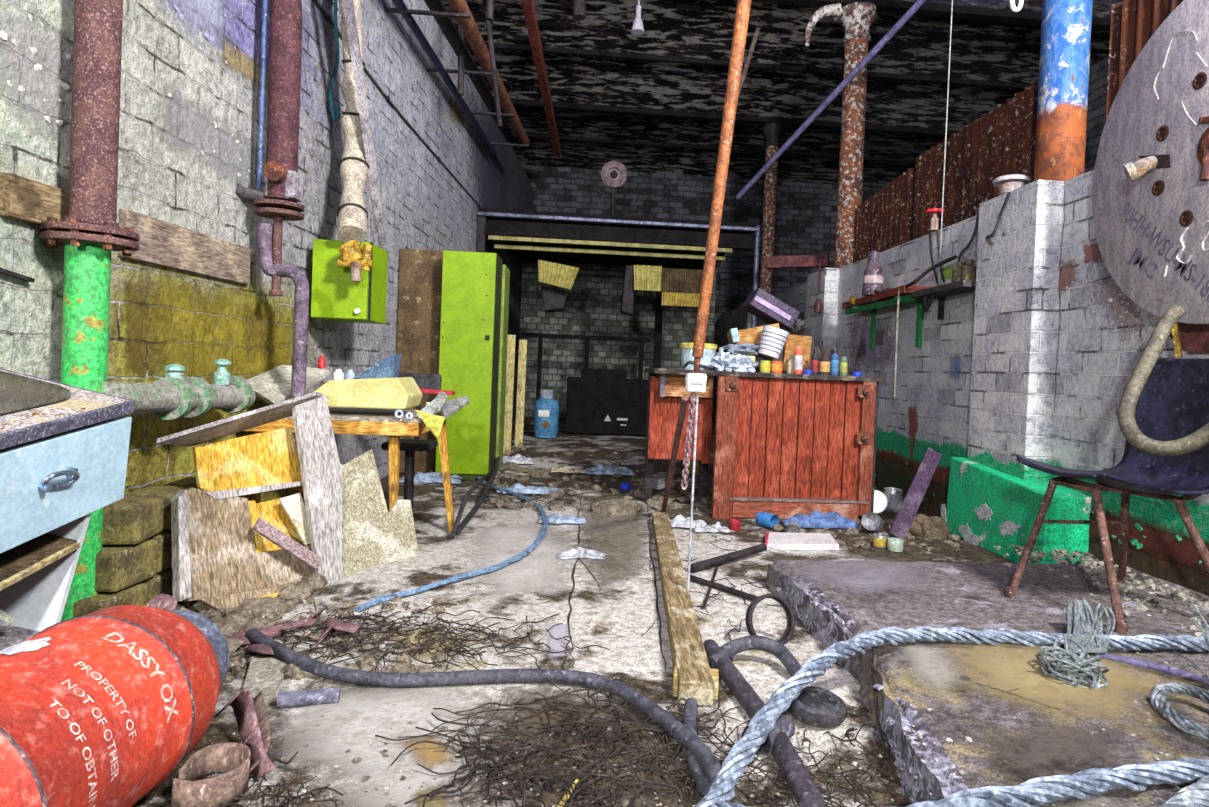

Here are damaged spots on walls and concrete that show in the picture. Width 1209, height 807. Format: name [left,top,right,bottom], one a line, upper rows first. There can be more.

crack [548,488,601,669]